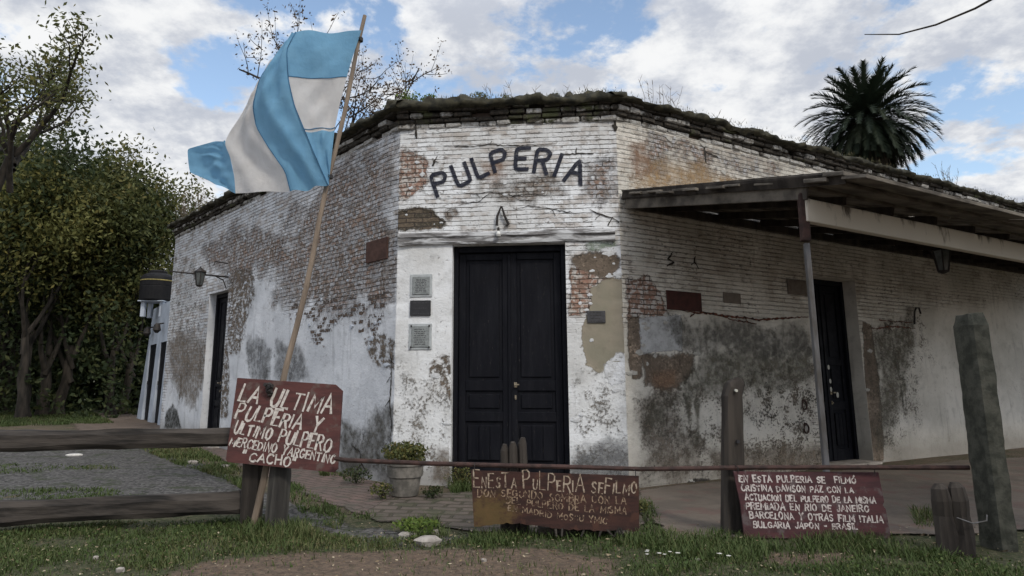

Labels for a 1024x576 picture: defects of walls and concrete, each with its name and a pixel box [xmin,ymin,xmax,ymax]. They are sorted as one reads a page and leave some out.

flaking render [636,130,781,178]
leakage [165,330,205,429]
flaking render [203,136,458,472]
peeling [568,245,808,475]
leakage [640,318,822,479]
leakage [875,314,934,446]